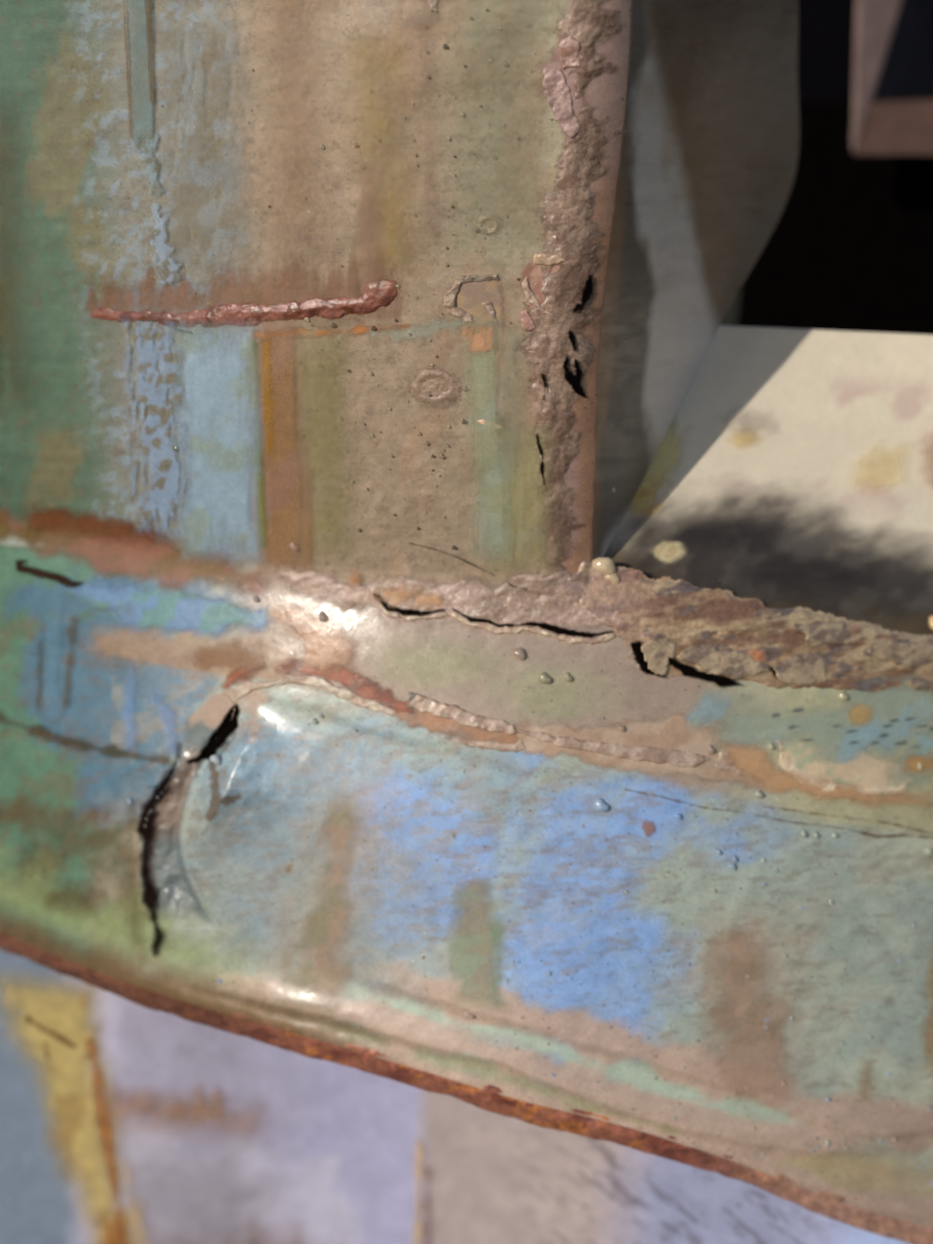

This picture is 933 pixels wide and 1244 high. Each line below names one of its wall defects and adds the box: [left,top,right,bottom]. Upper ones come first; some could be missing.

peeling [541,35,585,139]
water stain [125,0,180,284]
water stain [128,327,256,551]
crack [15,560,82,588]
corrosion [0,510,264,593]
corrosion [383,587,441,605]
corrosion [197,644,257,667]
corrosion [271,606,354,671]
peeling [641,620,933,691]